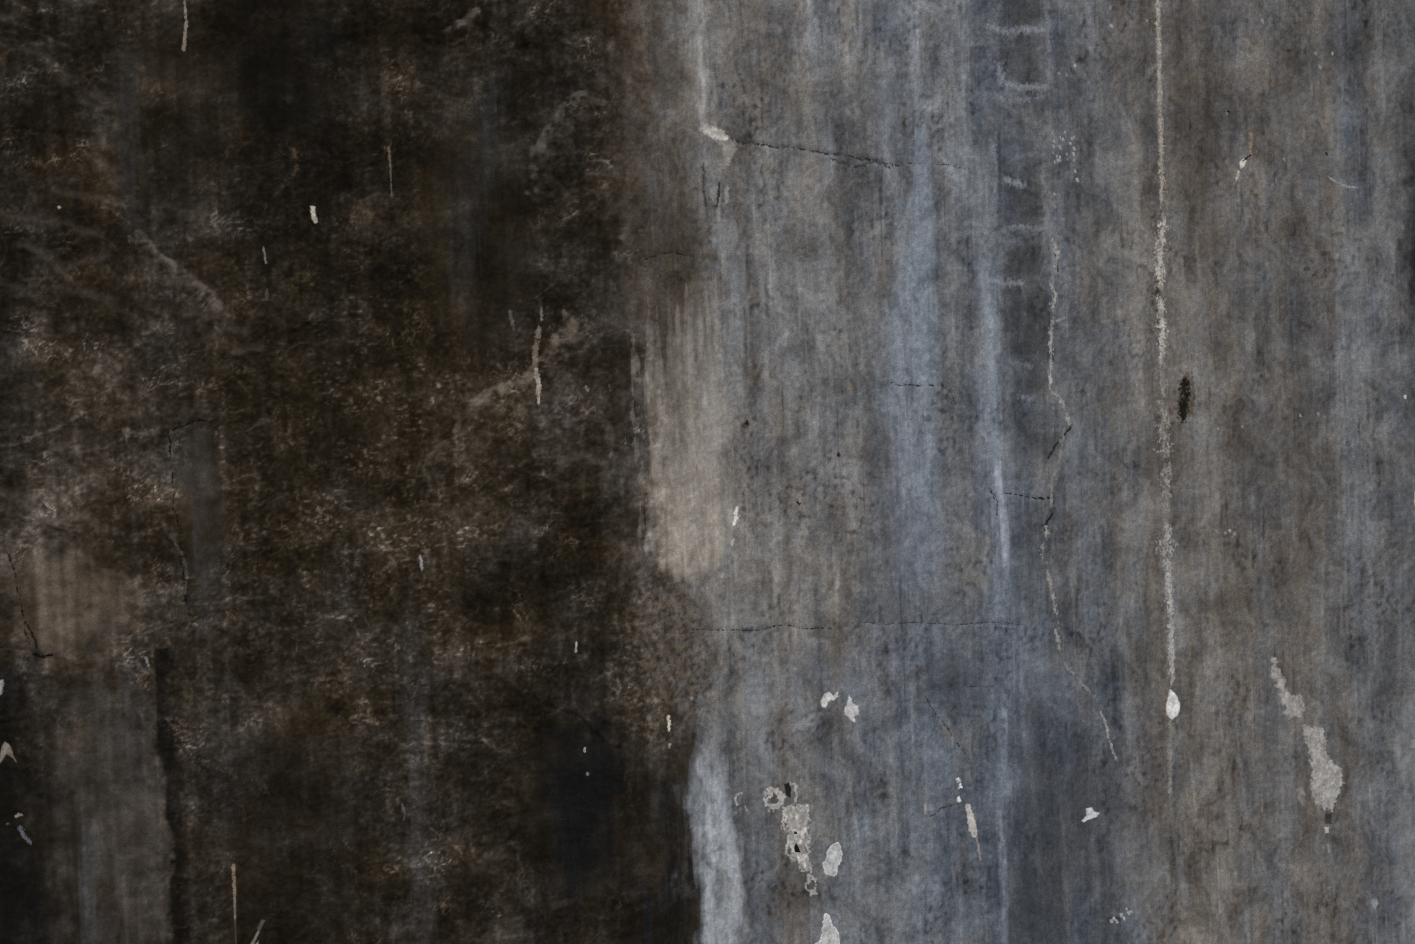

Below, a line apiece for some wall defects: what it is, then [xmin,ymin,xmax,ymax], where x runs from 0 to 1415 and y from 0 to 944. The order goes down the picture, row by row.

crack [730,138,966,170]
water stain [1114,0,1219,689]
crack [692,237,1118,762]
water stain [864,0,1190,944]
flaking render [733,781,843,897]
flaking render [814,913,840,944]
flaking render [1270,656,1346,854]